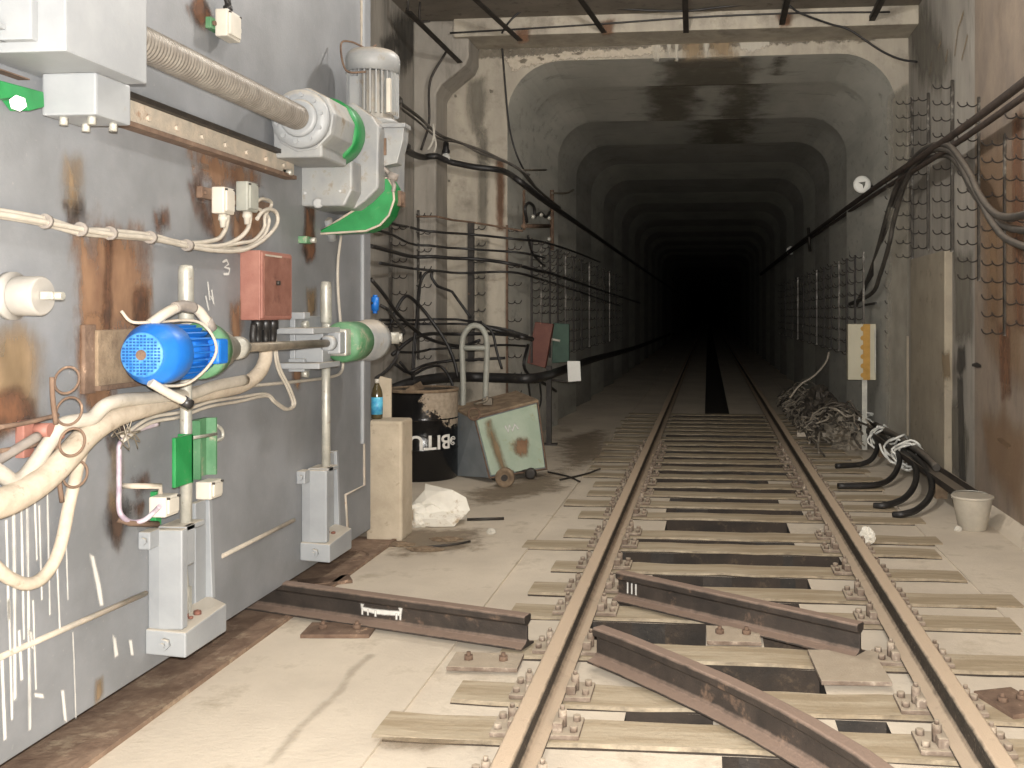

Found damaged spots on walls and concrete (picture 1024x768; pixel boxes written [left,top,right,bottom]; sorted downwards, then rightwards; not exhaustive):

spalling [504,45,665,72]
leakage [478,39,874,144]
rust [189,149,263,246]
rust [74,230,152,369]
rust [980,114,1023,399]
rust [85,390,110,409]